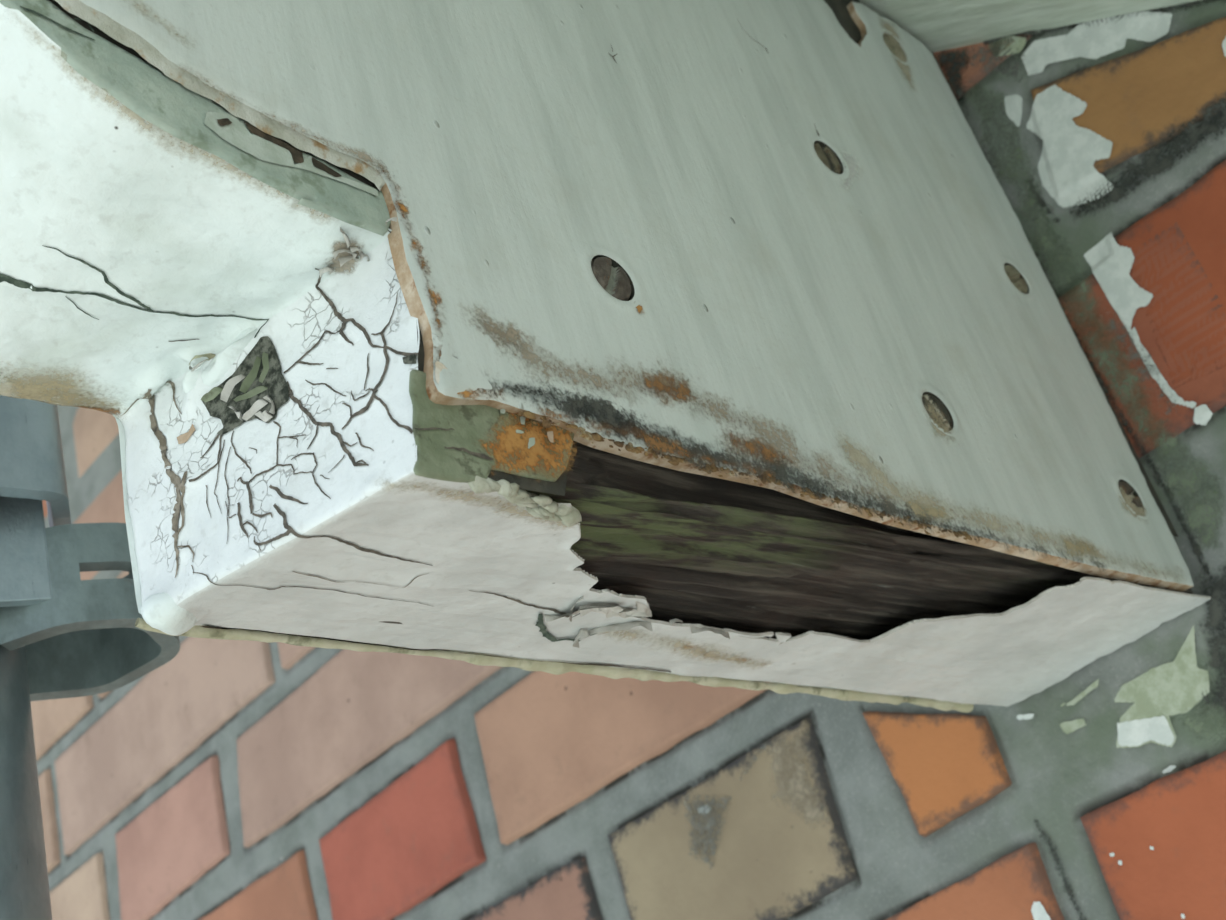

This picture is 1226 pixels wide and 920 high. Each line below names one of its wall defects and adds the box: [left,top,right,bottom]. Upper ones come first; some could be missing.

peeling [988,11,1172,76]
peeling [204,112,378,196]
peeling [1004,85,1113,208]
crack [0,245,269,342]
peeling [319,227,370,277]
peeling [1084,233,1213,426]
peeling [201,336,289,436]
crack [121,268,493,606]
corrosion [457,316,983,541]
peeling [468,476,582,527]
peeling [535,597,653,648]
peeling [1114,625,1210,748]